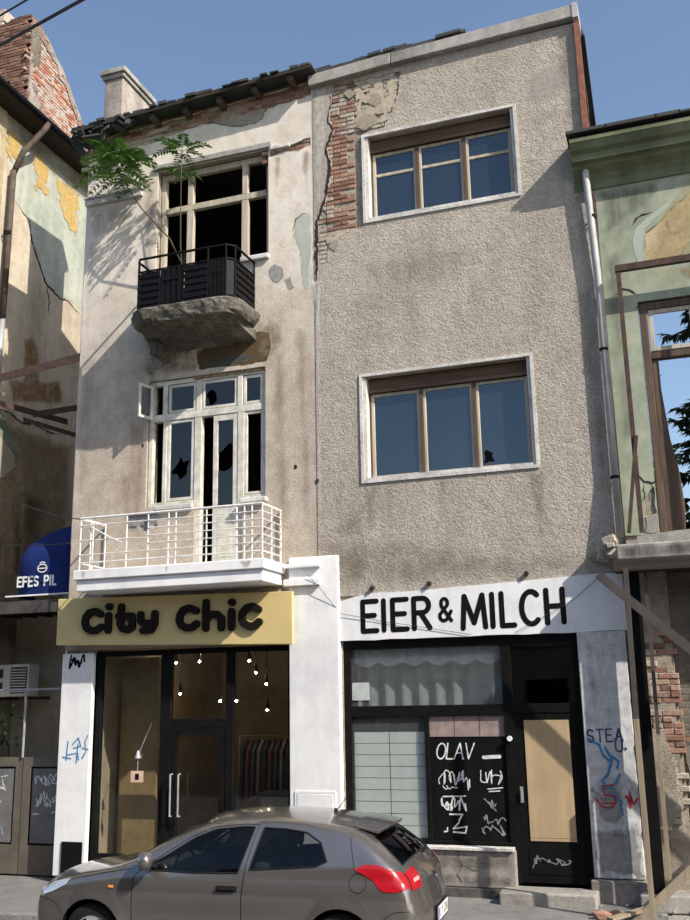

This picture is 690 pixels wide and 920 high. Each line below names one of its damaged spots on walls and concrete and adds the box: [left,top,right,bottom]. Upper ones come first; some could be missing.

spalling [23,42,77,138]
crack [20,208,80,315]
peeling [6,80,311,310]
crack [274,85,333,320]
spalling [269,73,400,290]
peeling [632,192,690,262]
peeling [0,411,22,454]
spalling [644,629,690,833]